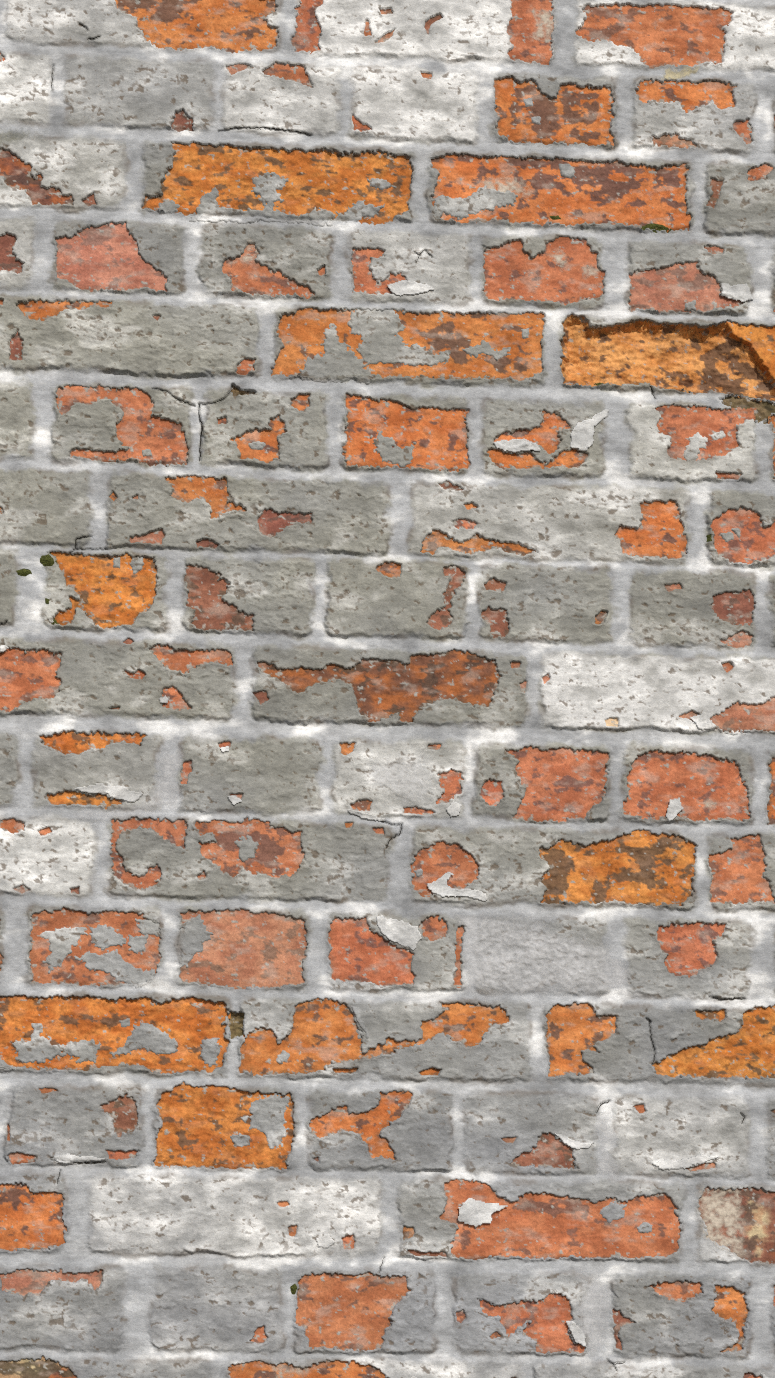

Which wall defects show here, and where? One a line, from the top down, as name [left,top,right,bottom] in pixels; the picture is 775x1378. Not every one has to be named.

peeling [115,0,323,88]
peeling [142,110,413,227]
peeling [218,0,775,638]
peeling [56,385,312,538]
peeling [51,529,165,644]
peeling [253,649,550,723]
peeling [47,783,305,890]
peeling [480,746,775,906]
peeling [0,887,509,1170]
peeling [652,1005,775,1079]
peeling [403,1179,681,1260]
peeling [228,1272,411,1378]